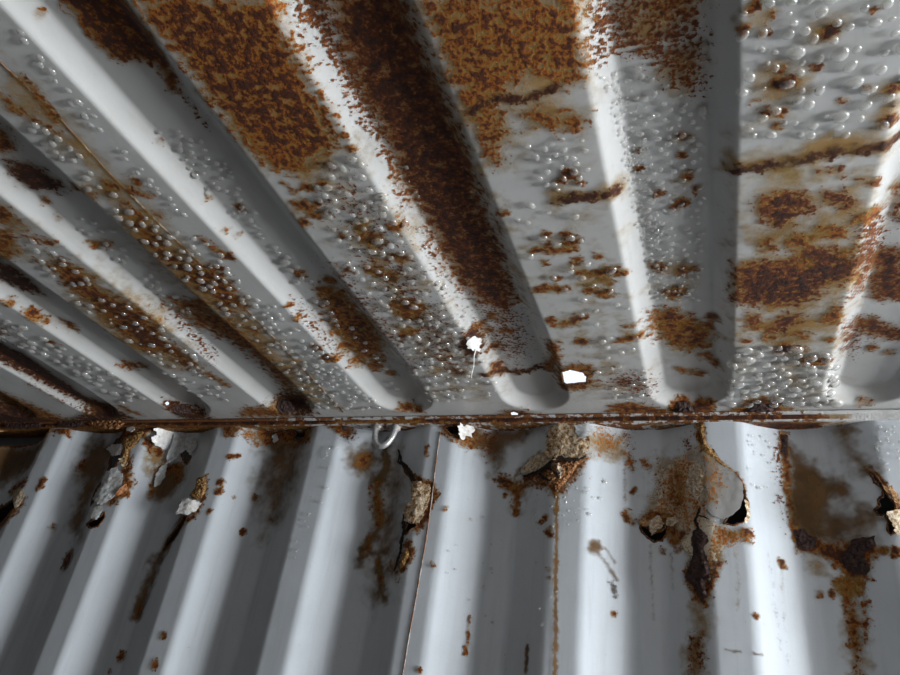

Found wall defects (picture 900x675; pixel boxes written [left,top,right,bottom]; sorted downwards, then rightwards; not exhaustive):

corrosion [813,21,841,43]
corrosion [748,62,825,130]
corrosion [0,123,65,207]
corrosion [59,0,717,413]
corrosion [722,83,900,367]
peeling [86,427,210,529]
peeling [398,473,441,574]
corrosion [0,175,900,675]
peeling [519,423,591,497]
peeling [638,515,678,535]
peeling [694,422,751,526]
peeling [883,485,900,535]